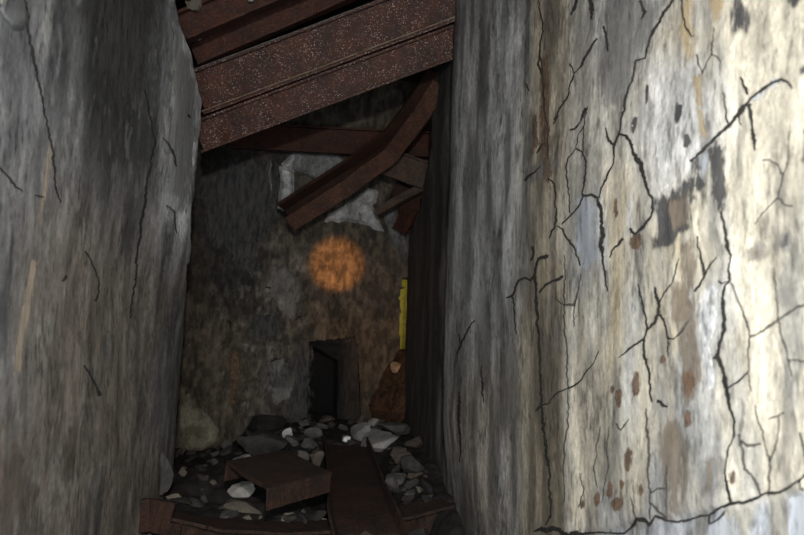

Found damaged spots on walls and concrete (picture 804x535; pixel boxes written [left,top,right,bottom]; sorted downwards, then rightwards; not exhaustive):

crack [0,0,61,203]
crack [506,0,804,535]
rust [610,386,622,407]
rust [632,372,641,396]
rust [624,448,632,472]
rust [580,480,624,511]